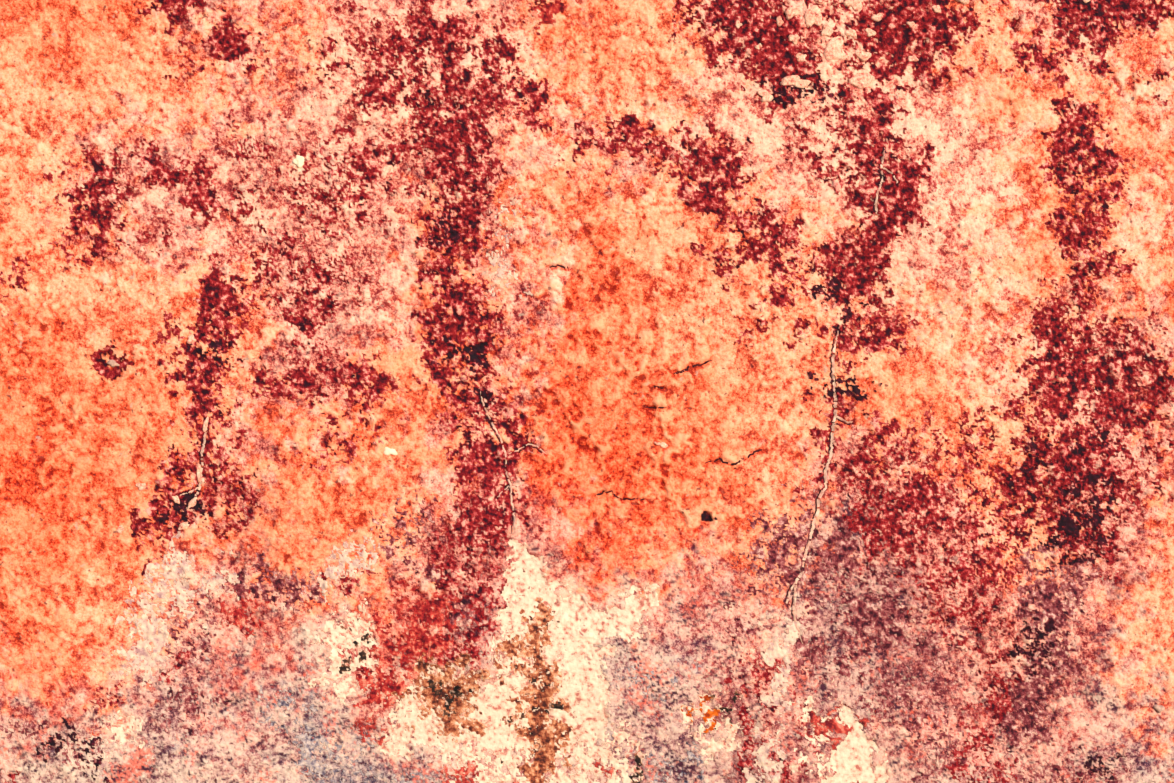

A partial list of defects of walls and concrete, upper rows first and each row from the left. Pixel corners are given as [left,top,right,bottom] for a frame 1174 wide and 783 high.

crack [784,331,853,644]